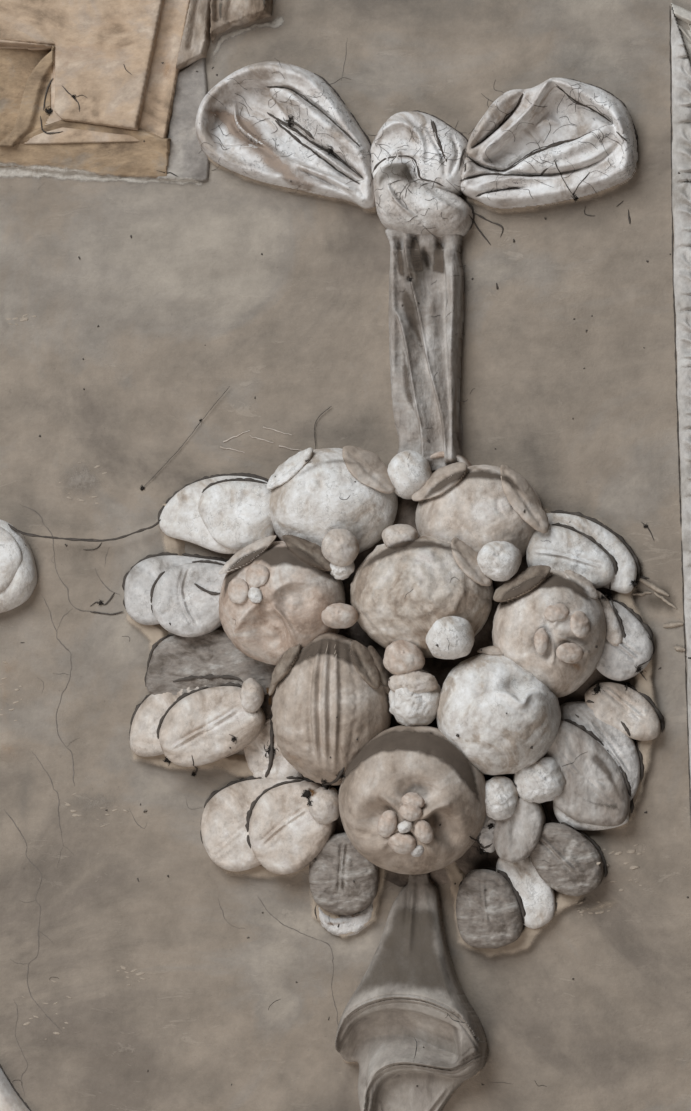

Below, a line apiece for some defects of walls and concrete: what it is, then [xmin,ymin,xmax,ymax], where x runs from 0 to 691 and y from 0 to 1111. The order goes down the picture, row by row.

crack [5,504,90,1096]
crack [261,901,338,1024]